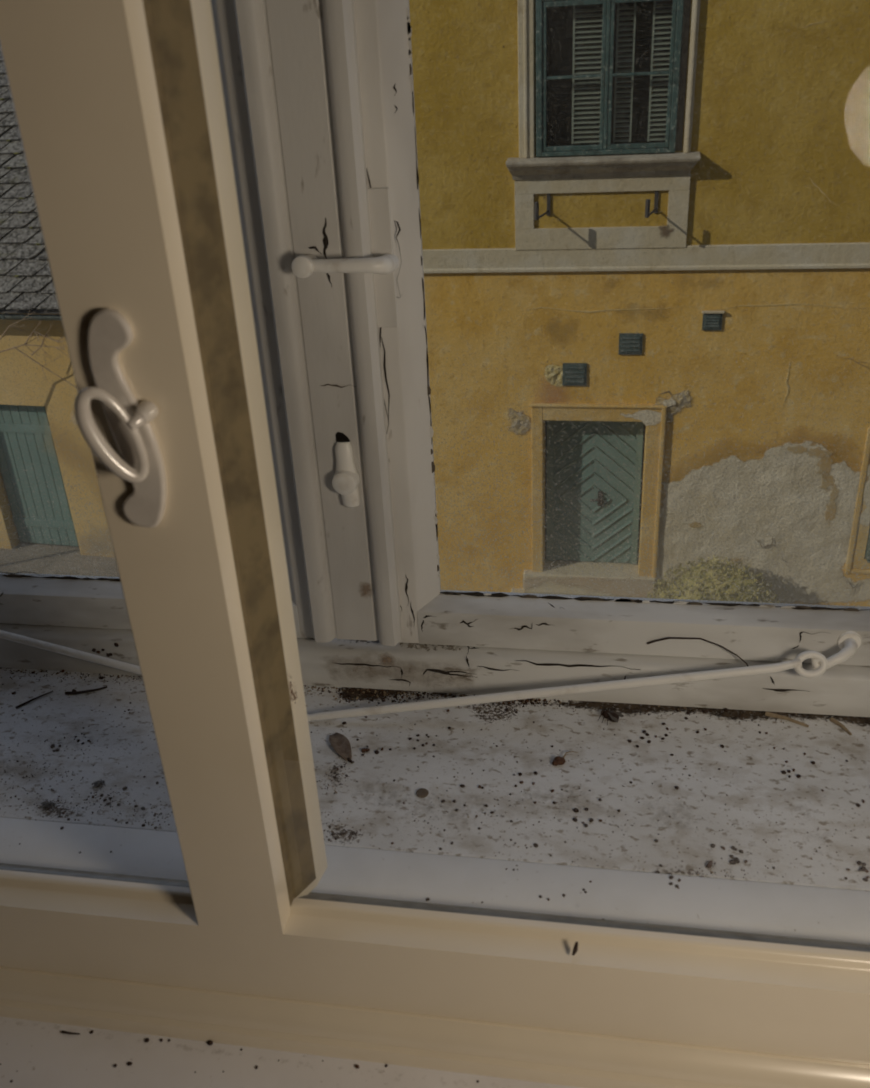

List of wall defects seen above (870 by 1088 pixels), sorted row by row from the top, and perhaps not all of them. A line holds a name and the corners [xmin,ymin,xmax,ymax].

peeling [406,8,419,189]
crack [309,218,332,287]
peeling [421,256,435,473]
flaking render [621,390,691,426]
flaking render [440,441,870,611]